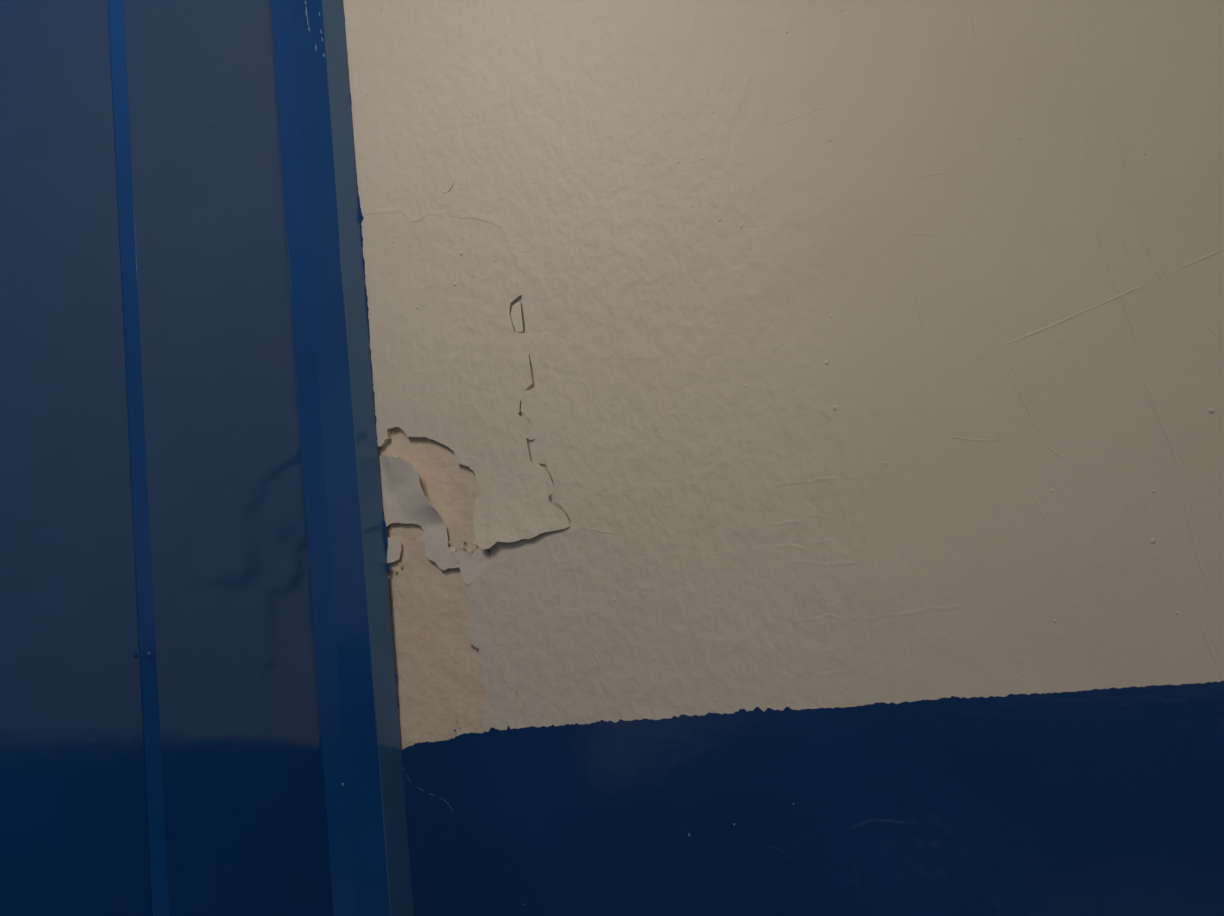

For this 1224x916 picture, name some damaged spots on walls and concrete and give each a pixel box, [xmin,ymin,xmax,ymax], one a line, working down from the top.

peeling [378,417,570,750]